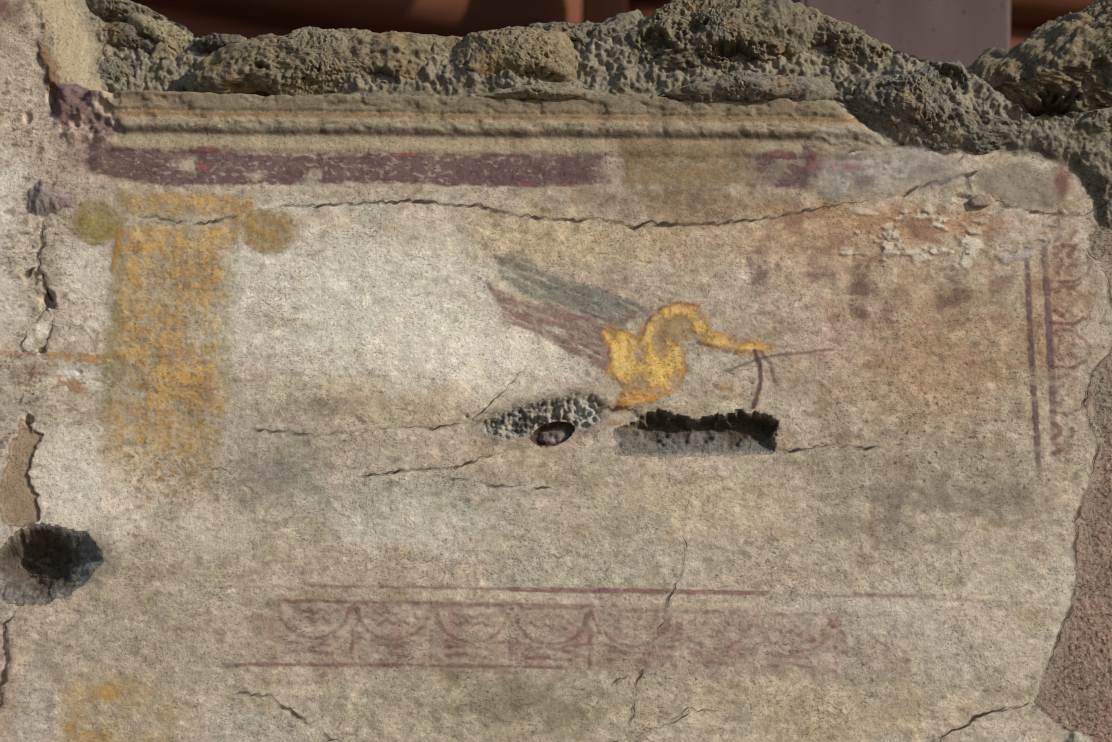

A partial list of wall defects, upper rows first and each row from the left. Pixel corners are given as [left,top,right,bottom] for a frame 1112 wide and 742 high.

crack [285,198,862,229]
crack [20,219,53,405]
spalling [477,393,604,439]
spalling [0,419,44,527]
crack [657,583,677,633]
crack [0,616,13,707]
crack [238,691,339,741]
crack [613,665,645,742]